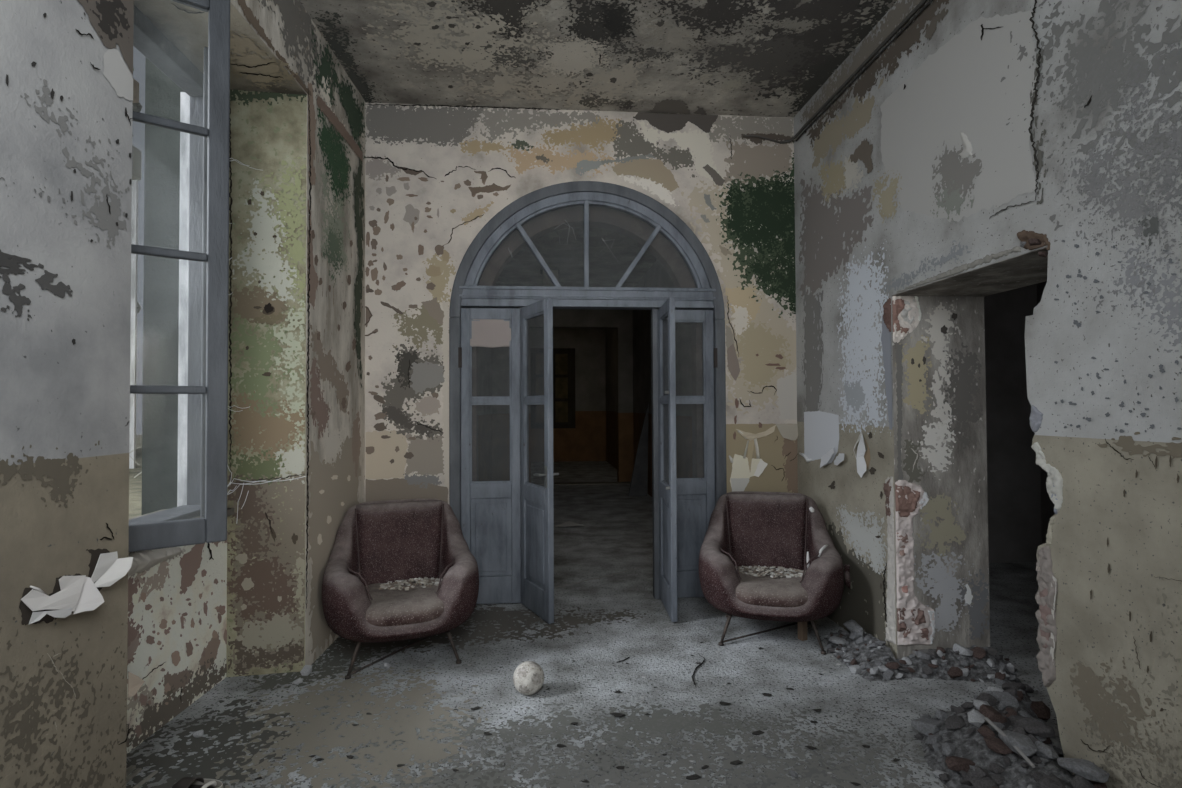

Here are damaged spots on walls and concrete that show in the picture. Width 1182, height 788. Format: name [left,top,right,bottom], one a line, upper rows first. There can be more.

damp [232,178,305,484]
peeling [127,323,448,706]
peeling [350,167,511,334]
crack [366,157,514,179]
damp [307,0,984,489]
flaking render [633,99,718,133]
damp [826,504,890,646]
damp [914,493,990,640]
flaking render [864,230,1050,646]
damp [930,143,996,223]
crack [989,0,1041,219]
flaking render [1030,405,1063,687]